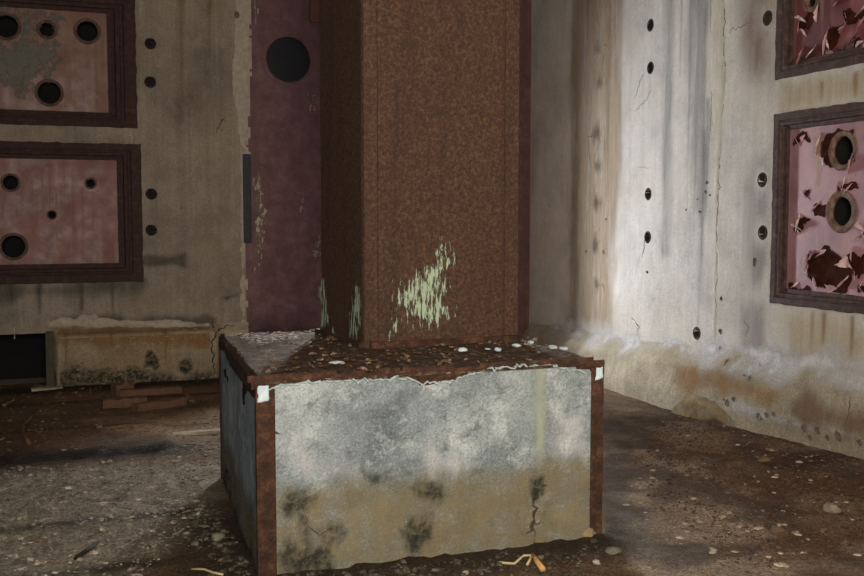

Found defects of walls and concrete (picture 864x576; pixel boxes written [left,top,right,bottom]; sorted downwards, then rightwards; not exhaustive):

peeling [795,1,864,64]
peeling [792,128,859,194]
peeling [790,189,827,235]
peeling [788,222,864,296]
peeling [349,286,362,340]
peeling [389,242,457,341]
damp [54,351,211,386]
crack [208,323,233,375]
corrosion [218,333,604,398]
damp [733,346,864,389]
damp [276,369,590,573]
crack [524,483,548,543]